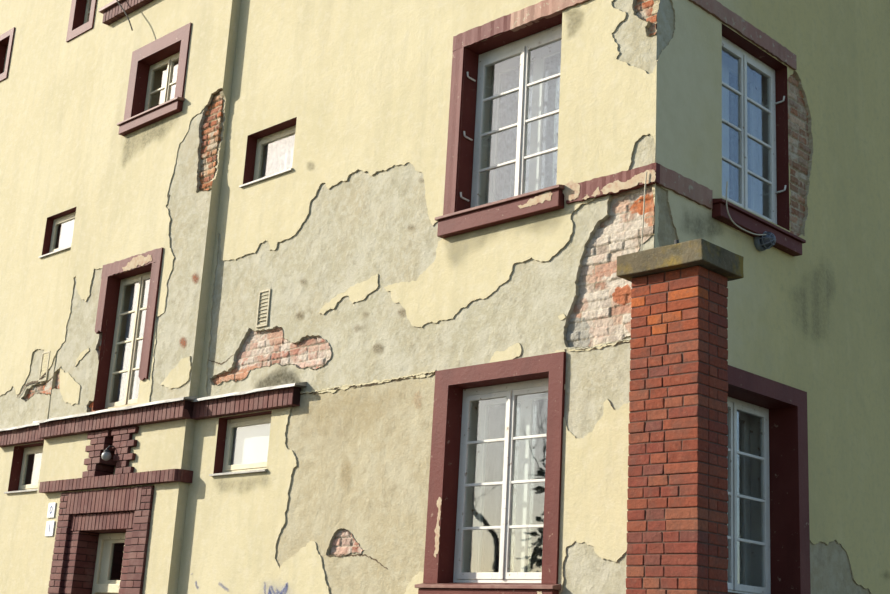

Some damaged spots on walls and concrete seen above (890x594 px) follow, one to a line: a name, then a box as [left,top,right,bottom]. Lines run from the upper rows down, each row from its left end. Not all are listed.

peeling [611,0,675,74]
flaking render [783,70,813,236]
peeling [149,88,226,402]
peeling [0,268,108,429]
peeling [205,133,679,594]
peeling [810,540,871,594]